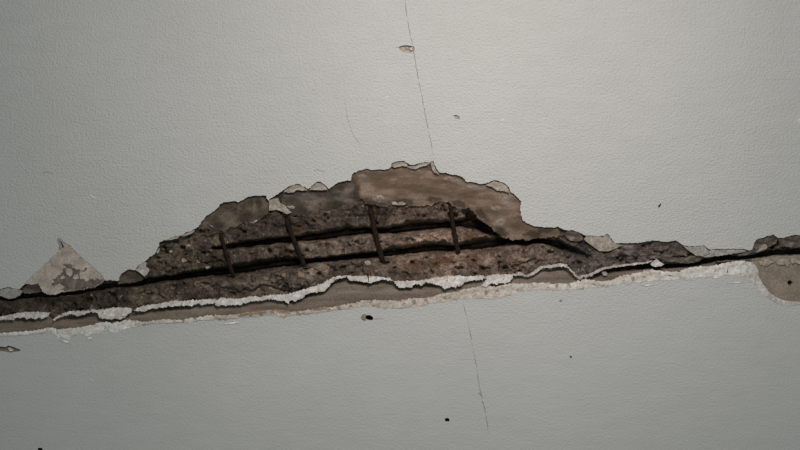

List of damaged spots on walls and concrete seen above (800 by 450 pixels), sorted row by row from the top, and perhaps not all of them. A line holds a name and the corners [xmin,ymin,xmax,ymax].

peeling [397,43,415,53]
crack [405,3,432,147]
spalling [0,161,800,343]